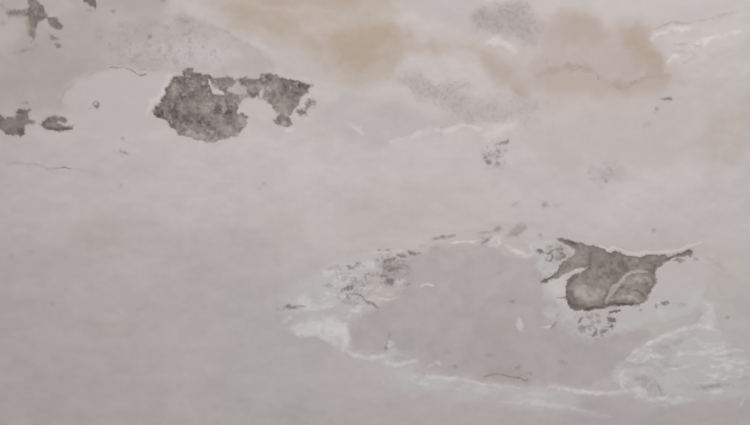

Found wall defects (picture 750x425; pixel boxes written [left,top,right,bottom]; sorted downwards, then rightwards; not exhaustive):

spalling [0,101,75,139]
spalling [151,67,316,146]
damp [0,0,750,189]
damp [275,237,750,420]
peeling [320,222,732,390]